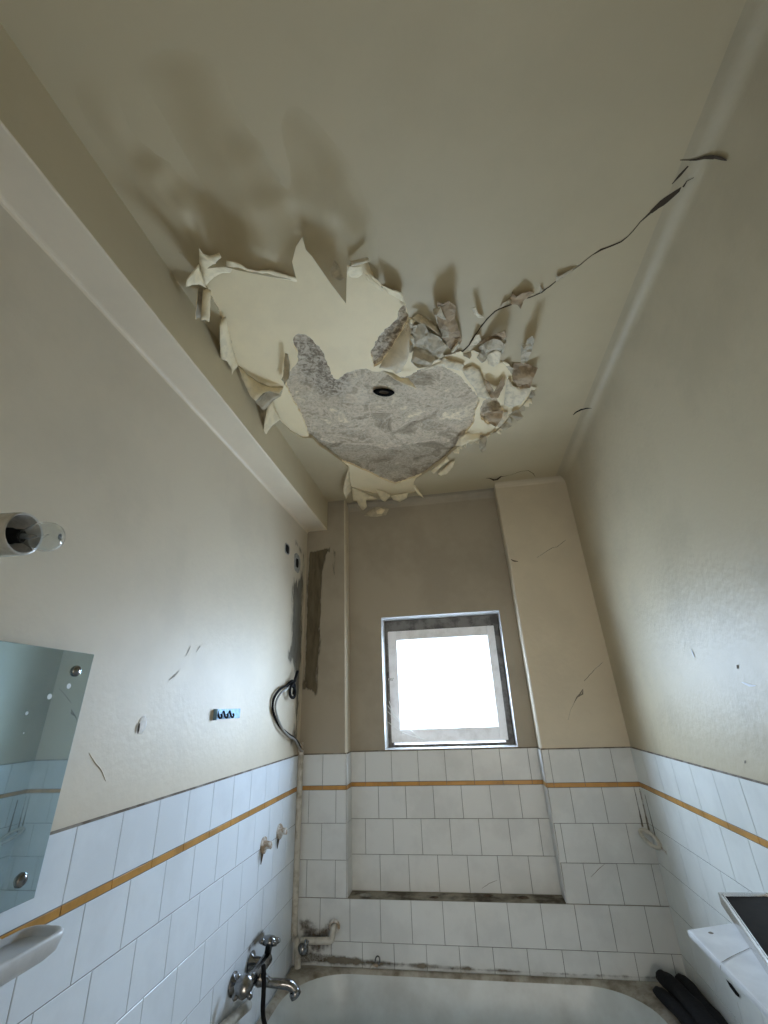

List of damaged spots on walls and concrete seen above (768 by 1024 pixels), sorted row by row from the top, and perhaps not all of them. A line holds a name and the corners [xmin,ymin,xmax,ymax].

crack [461,155,727,352]
peeling [207,238,538,517]
water stain [301,953,473,971]